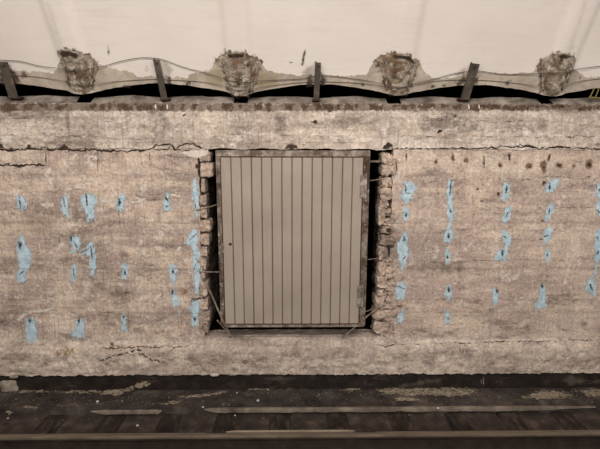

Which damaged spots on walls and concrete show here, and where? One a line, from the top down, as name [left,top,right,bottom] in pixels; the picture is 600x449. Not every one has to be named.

spalling [15,47,467,97]
spalling [474,51,600,96]
crack [0,134,207,171]
crack [390,135,600,150]
crack [99,344,188,362]